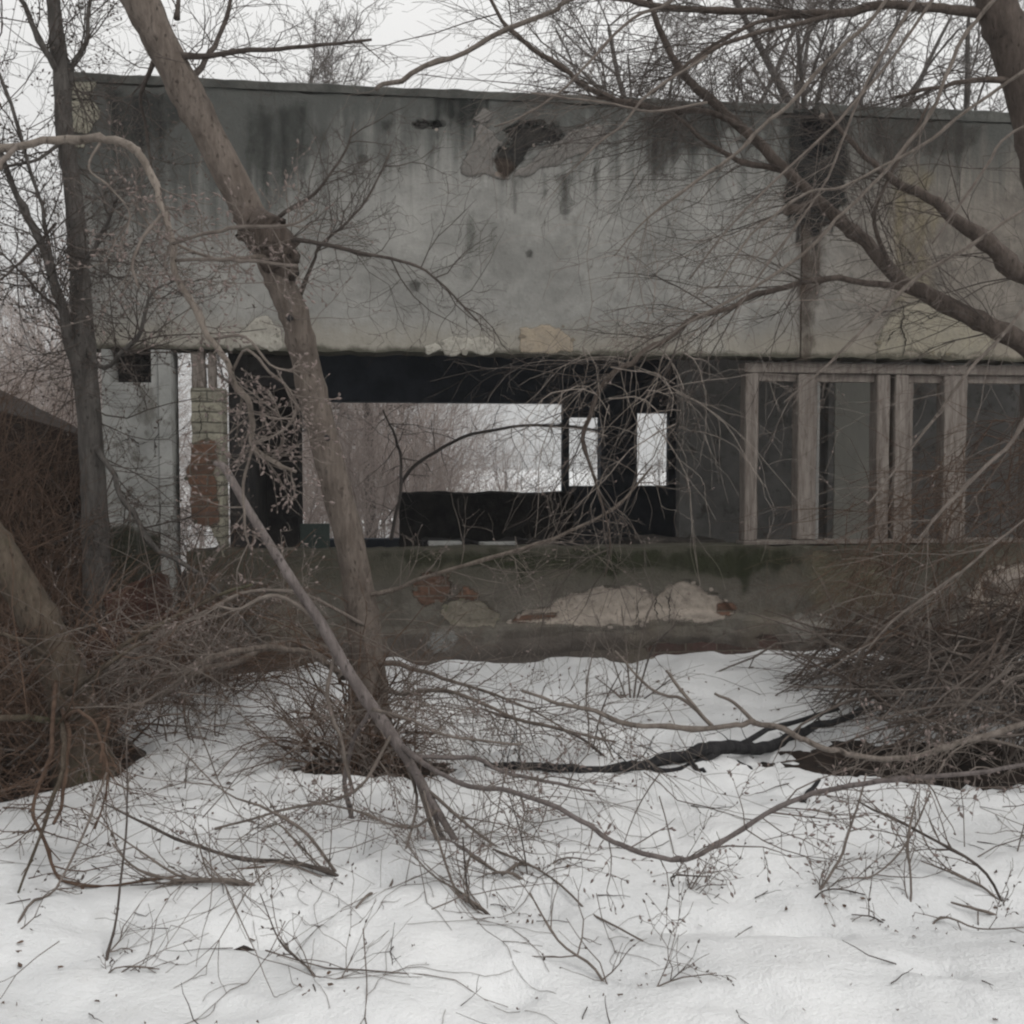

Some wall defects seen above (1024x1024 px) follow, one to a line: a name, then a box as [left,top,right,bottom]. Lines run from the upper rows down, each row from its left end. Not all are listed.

peeling [460,109,606,180]
water stain [783,110,850,242]
peeling [424,325,575,357]
spalling [184,438,219,527]
spalling [440,580,737,629]